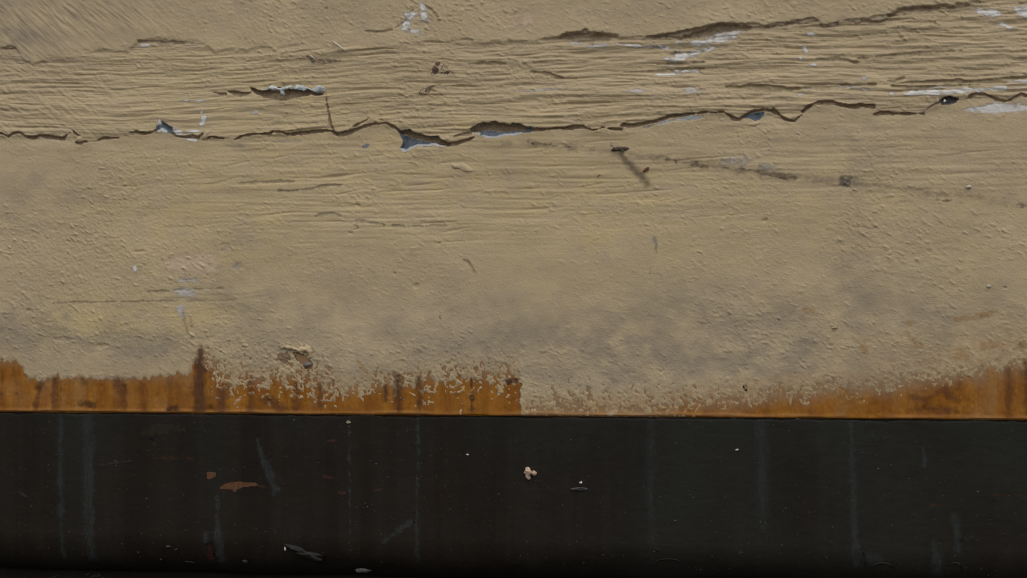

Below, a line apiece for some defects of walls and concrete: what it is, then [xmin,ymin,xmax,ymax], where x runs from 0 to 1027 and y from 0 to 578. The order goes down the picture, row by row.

crack [365,4,441,34]
peeling [250,85,326,101]
crack [0,98,400,145]
spalling [398,129,452,153]
crack [443,132,475,147]
spalling [470,121,532,138]